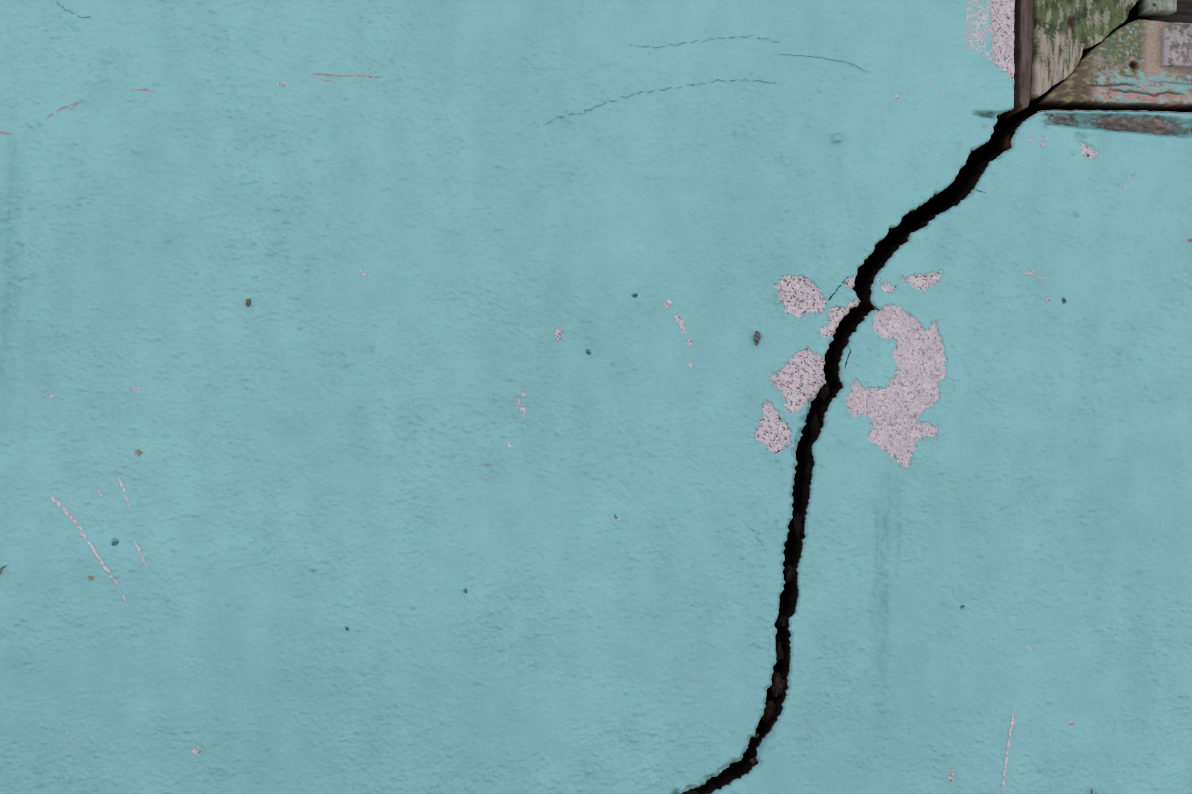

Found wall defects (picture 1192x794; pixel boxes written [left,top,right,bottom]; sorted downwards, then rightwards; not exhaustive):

crack [625,35,870,73]
peeling [962,0,1015,81]
crack [547,79,783,124]
peeling [773,274,859,341]
peeling [754,346,826,454]
peeling [846,270,947,469]
crack [682,110,1036,794]